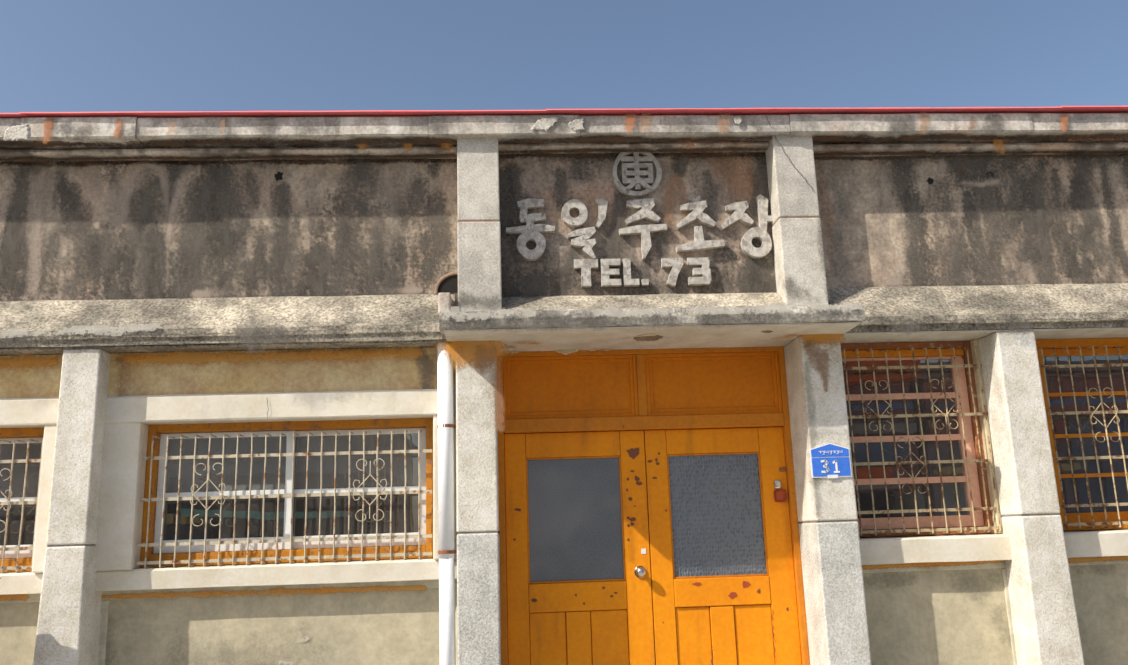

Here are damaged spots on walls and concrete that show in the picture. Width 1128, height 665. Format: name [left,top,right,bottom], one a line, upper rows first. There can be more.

water stain [0,155,457,302]
water stain [459,148,796,305]
crack [765,114,820,199]
water stain [814,151,1128,287]
peeling [626,448,660,541]